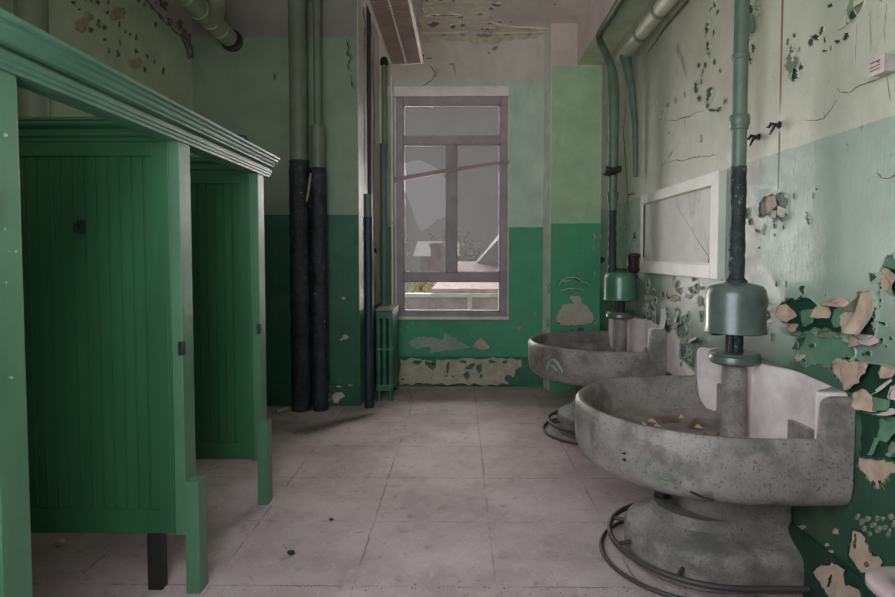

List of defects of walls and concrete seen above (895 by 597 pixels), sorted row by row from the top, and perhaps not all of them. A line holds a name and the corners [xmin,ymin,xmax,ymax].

peeling [70,0,166,76]
peeling [137,0,193,59]
peeling [418,0,547,54]
peeling [650,0,728,121]
peeling [784,0,865,82]
crack [855,0,887,59]
crack [805,77,891,121]
peeling [746,192,796,237]
peeling [547,295,596,332]
spalling [399,333,522,386]
peeling [767,252,895,491]
spalling [812,513,895,597]